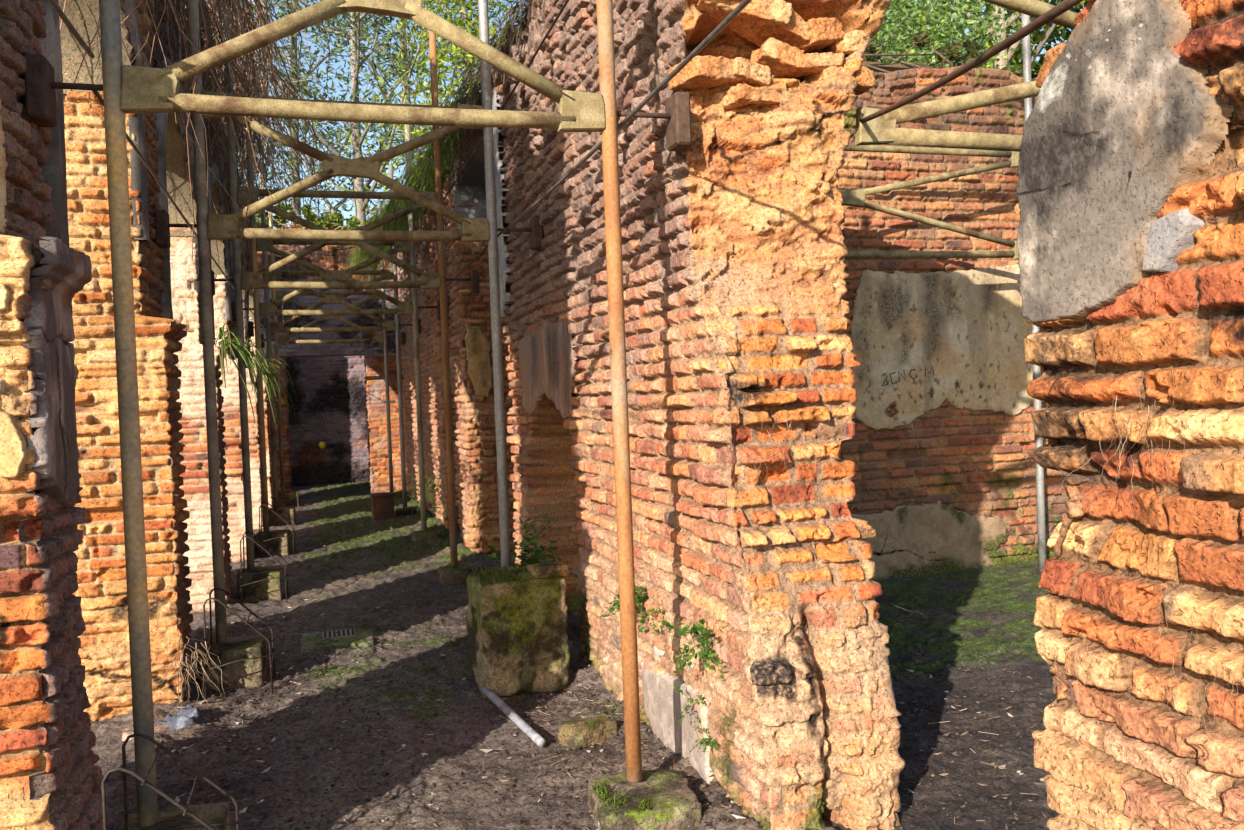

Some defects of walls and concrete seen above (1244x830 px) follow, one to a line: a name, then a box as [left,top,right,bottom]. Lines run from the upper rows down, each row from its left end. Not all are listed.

spalling [669,0,875,110]
peeling [0,0,92,504]
peeling [128,113,249,358]
peeling [850,0,1234,430]
peeling [851,500,1007,580]